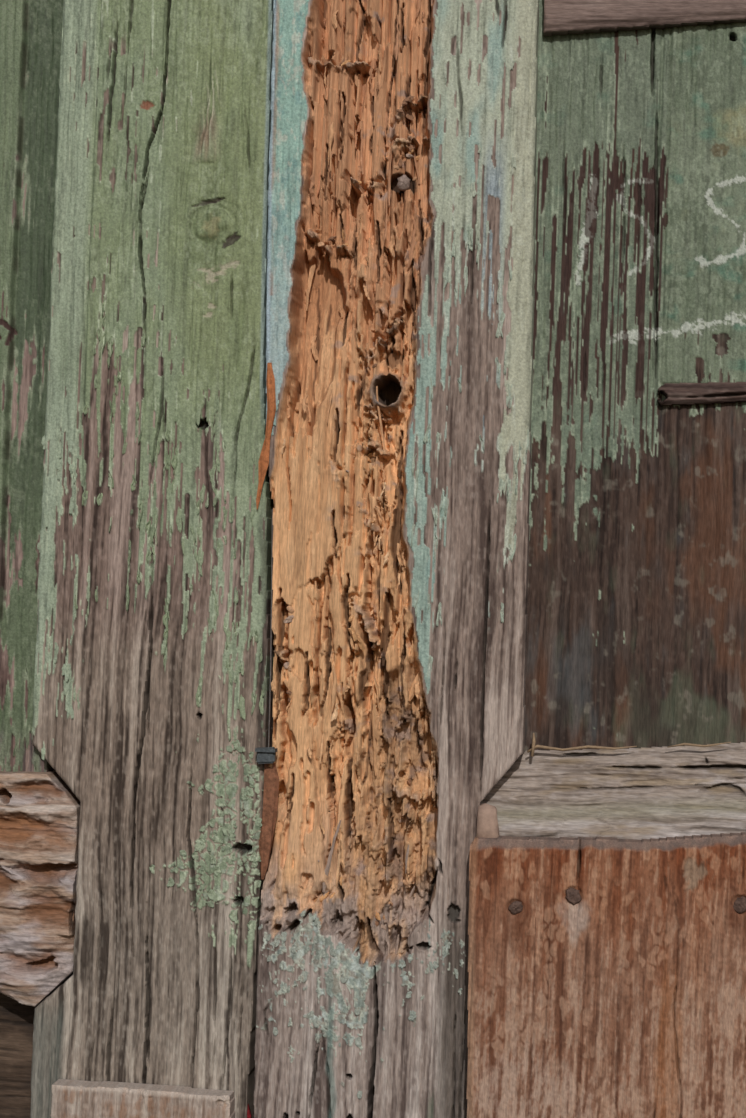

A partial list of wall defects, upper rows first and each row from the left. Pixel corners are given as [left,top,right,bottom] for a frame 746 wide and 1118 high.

crack [138,0,171,345]
peeling [408,0,530,693]
peeling [695,332,731,383]
peeling [0,0,370,1114]
crack [142,936,150,1084]
peeling [382,860,470,1046]